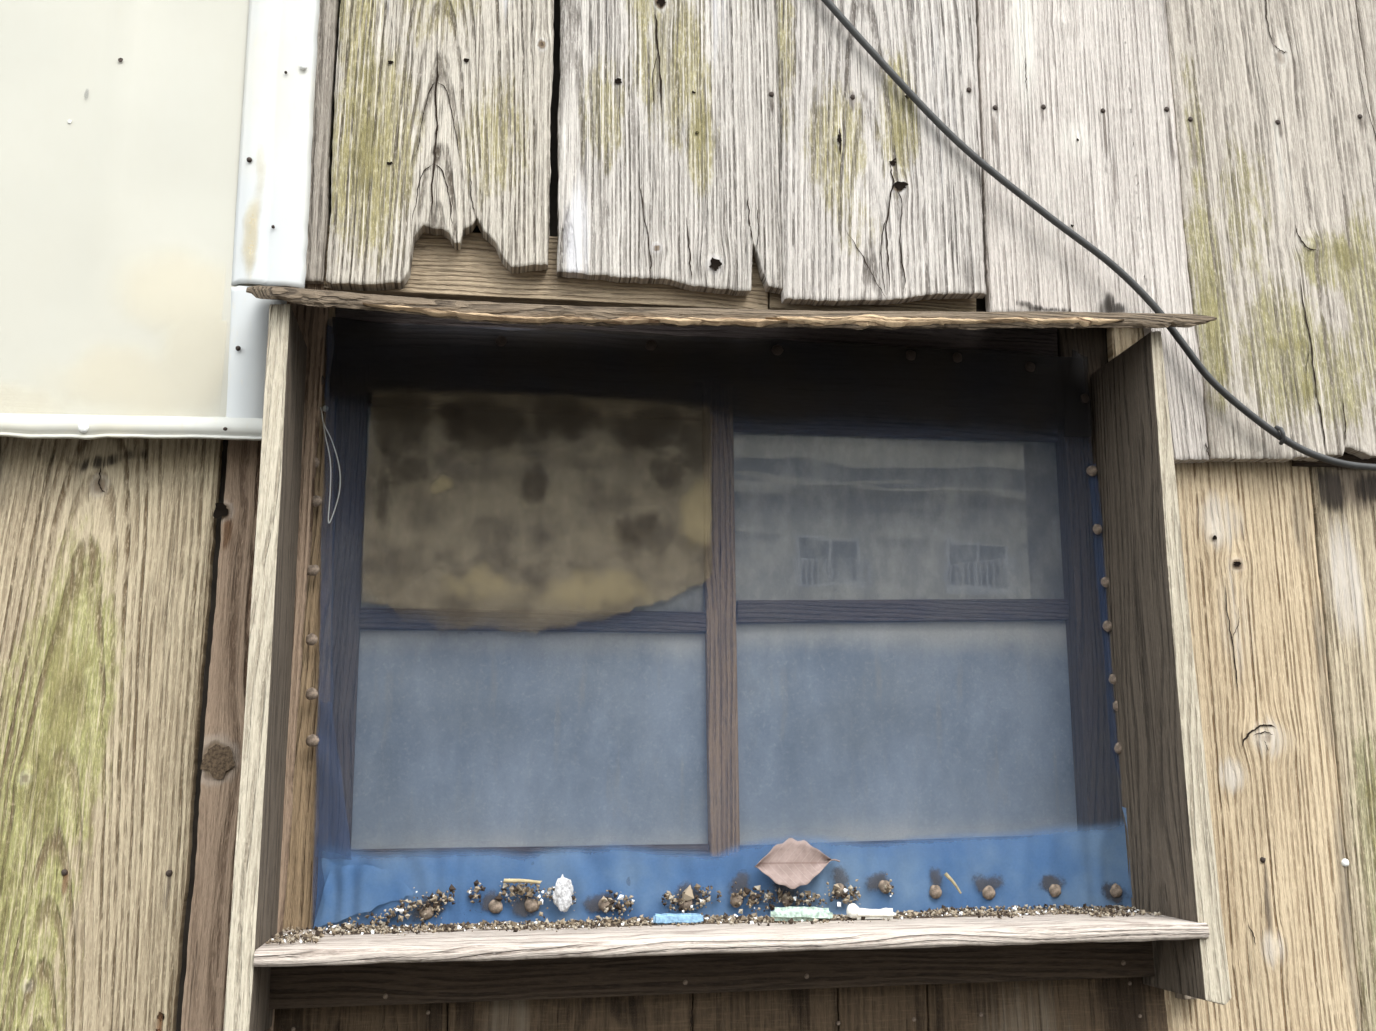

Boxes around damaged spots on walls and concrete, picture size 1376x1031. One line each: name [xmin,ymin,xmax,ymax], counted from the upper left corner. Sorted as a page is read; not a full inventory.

crack [411,51,475,226]
crack [845,158,906,298]